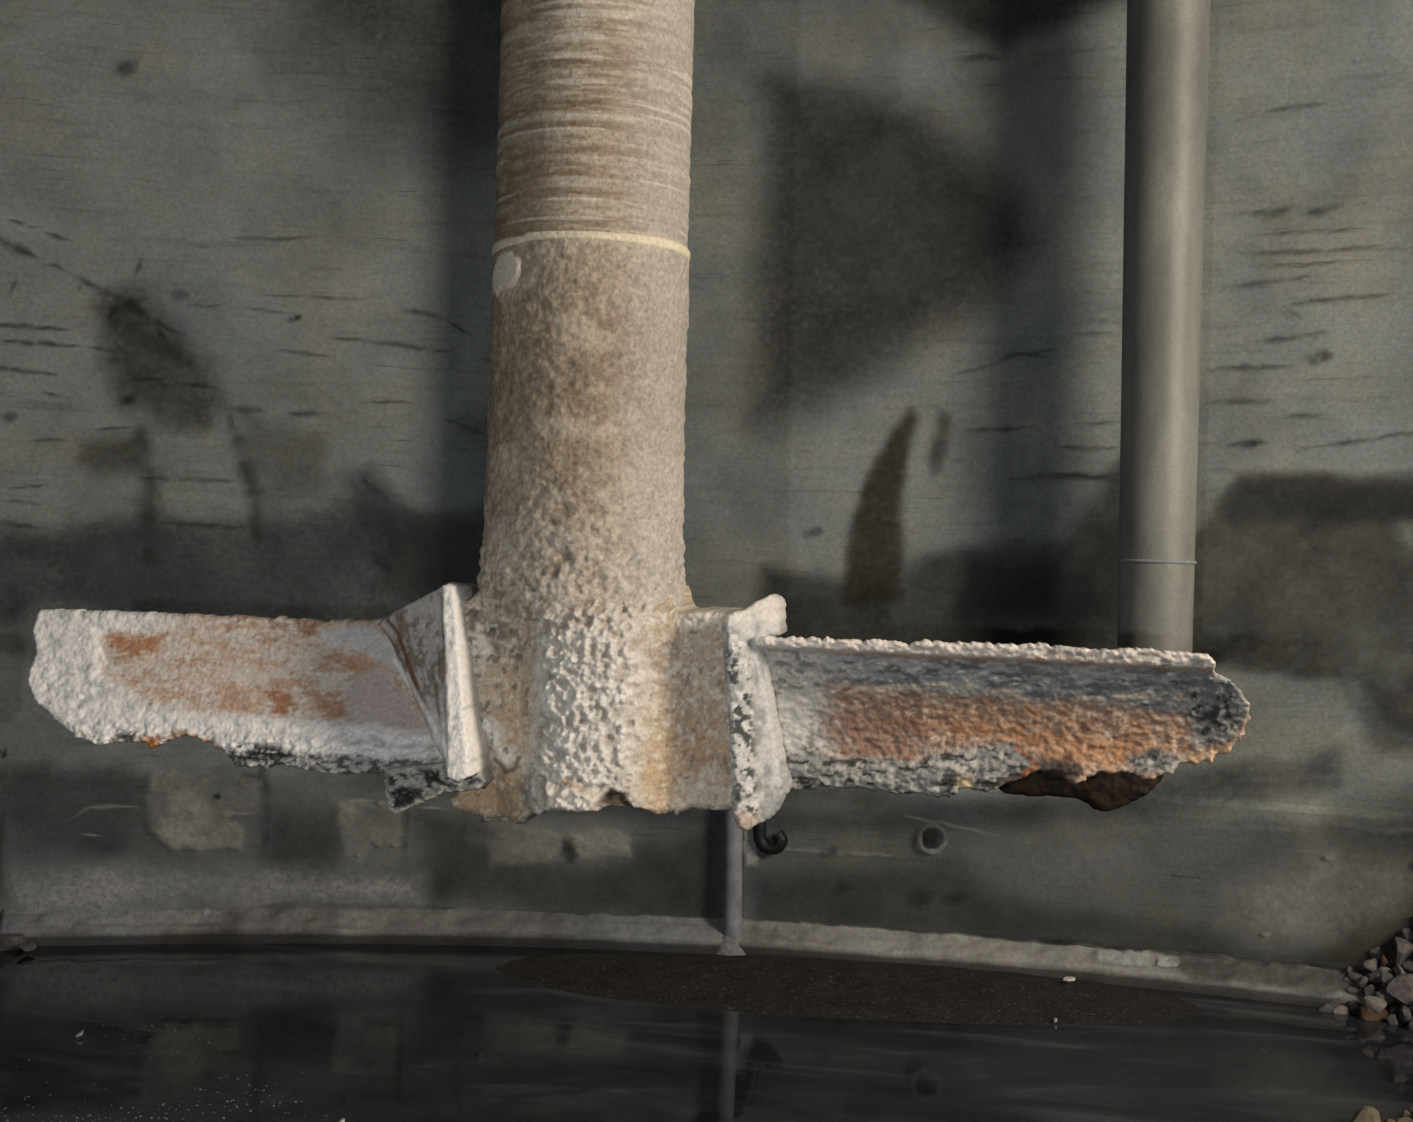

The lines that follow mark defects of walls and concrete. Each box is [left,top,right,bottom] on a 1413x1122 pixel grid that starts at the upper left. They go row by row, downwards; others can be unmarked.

crack [5,324,76,395]